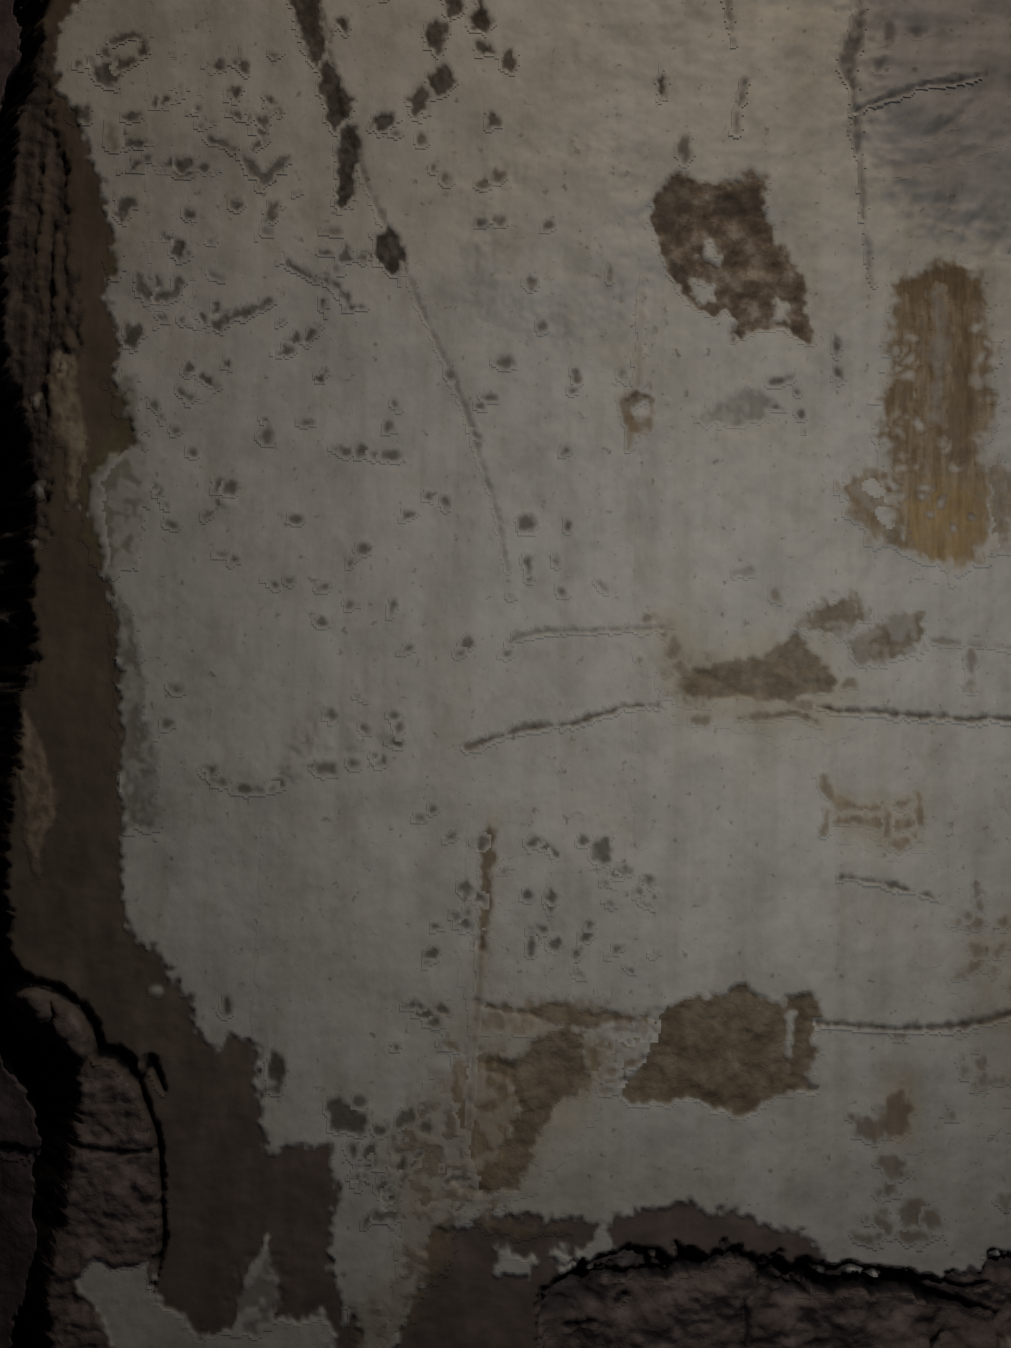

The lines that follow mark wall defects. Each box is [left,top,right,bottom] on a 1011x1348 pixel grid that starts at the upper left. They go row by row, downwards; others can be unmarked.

peeling [646,130,848,386]
peeling [691,372,808,435]
corrosion [833,253,1011,588]
crack [0,0,170,1348]
peeling [0,0,521,1348]
crack [460,699,663,755]
peeling [633,562,1011,748]
crack [813,700,1011,727]
crack [836,870,939,902]
peeling [395,831,1011,1348]
crack [812,1006,1011,1035]
crack [538,1240,997,1348]